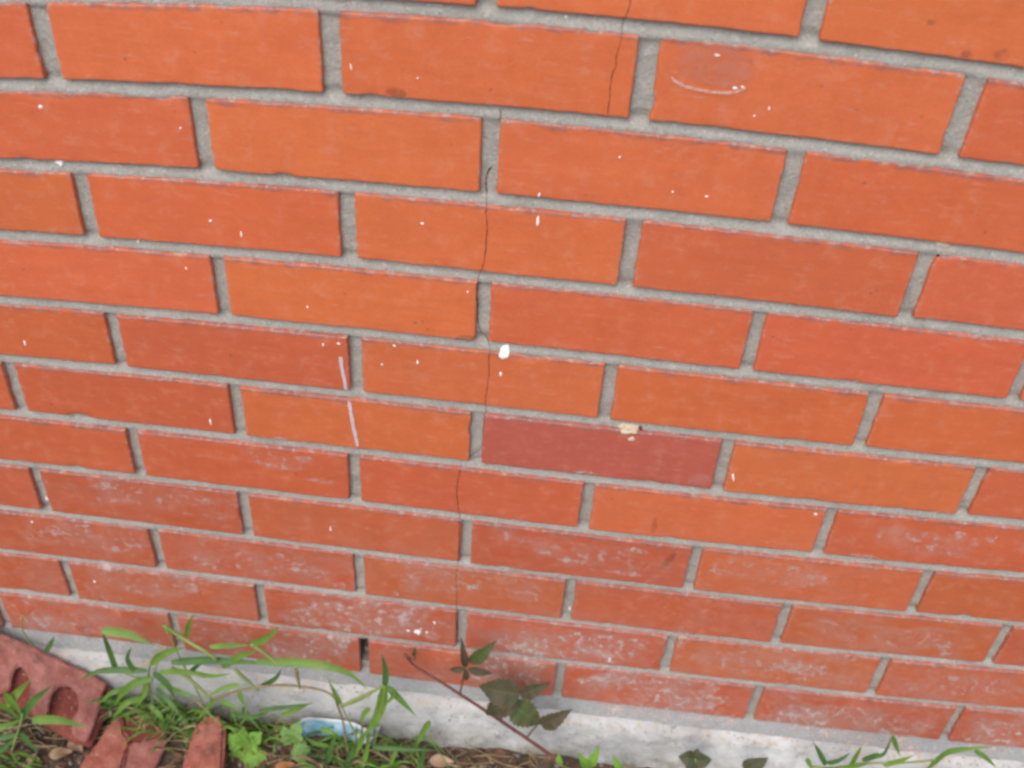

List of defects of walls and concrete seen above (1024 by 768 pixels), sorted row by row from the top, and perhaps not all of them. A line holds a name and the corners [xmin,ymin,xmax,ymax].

crack [608,0,631,109]
crack [456,166,492,643]